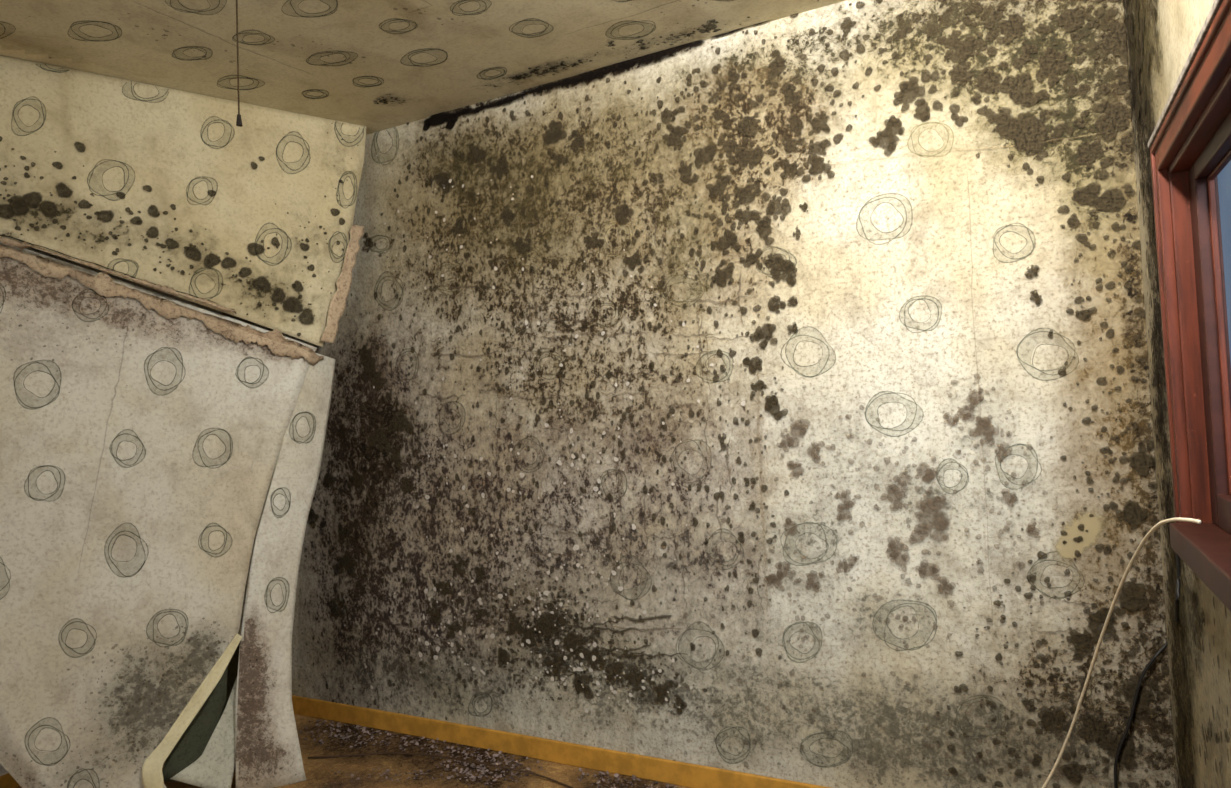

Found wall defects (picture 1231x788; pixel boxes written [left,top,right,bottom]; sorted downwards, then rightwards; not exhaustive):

leakage [0,257,282,360]
leakage [0,136,344,337]
leakage [300,0,1231,788]
leakage [93,631,222,780]
leakage [235,608,294,784]